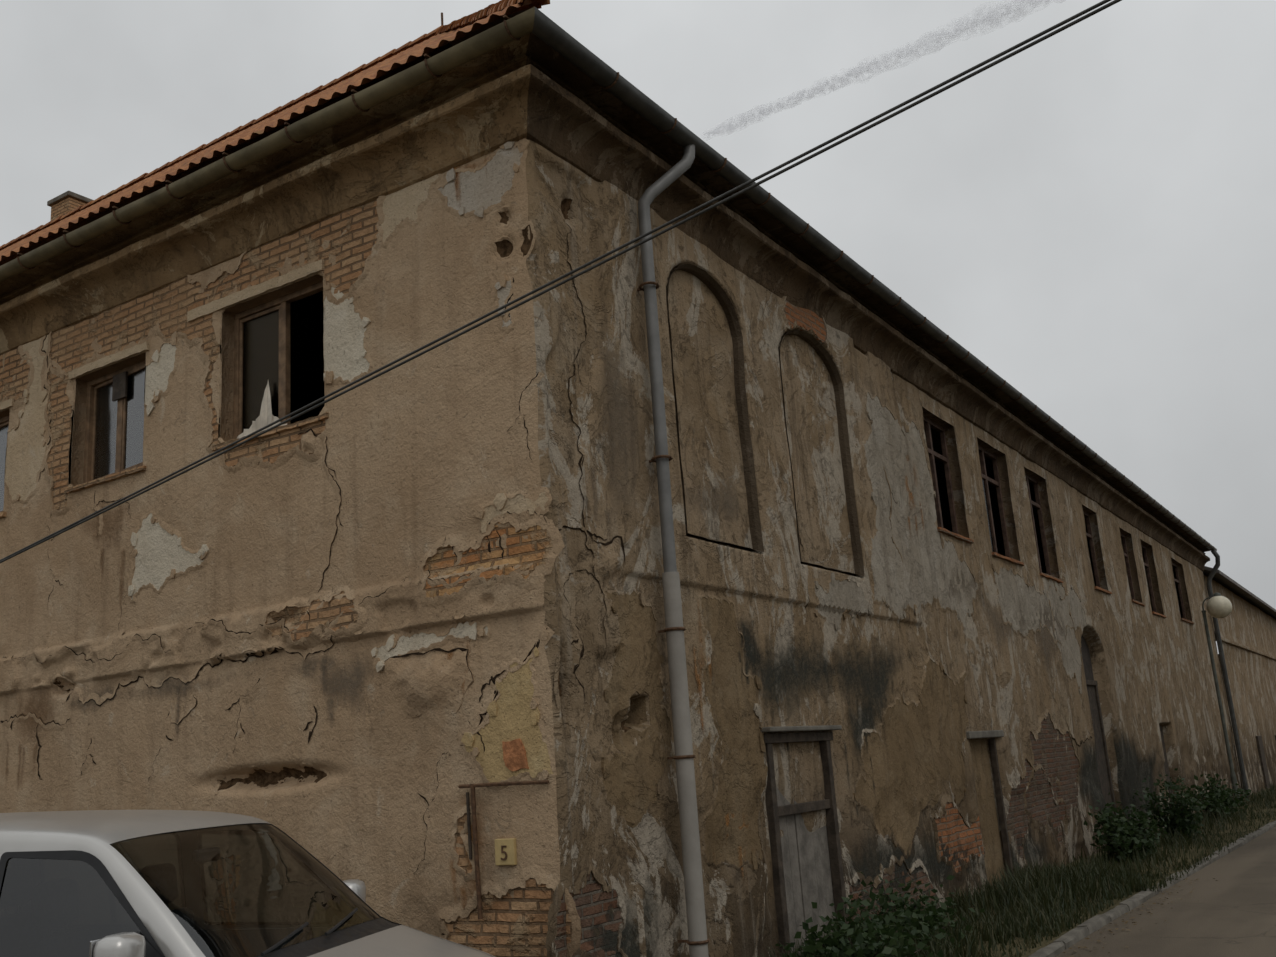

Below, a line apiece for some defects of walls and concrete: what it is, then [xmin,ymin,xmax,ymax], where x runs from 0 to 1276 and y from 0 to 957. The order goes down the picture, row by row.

flaking render [0,138,536,517]
flaking render [128,510,209,604]
crack [0,222,611,780]
flaking render [263,487,565,673]
flaking render [461,624,557,791]
water stain [739,624,895,775]
flaking render [434,804,628,957]